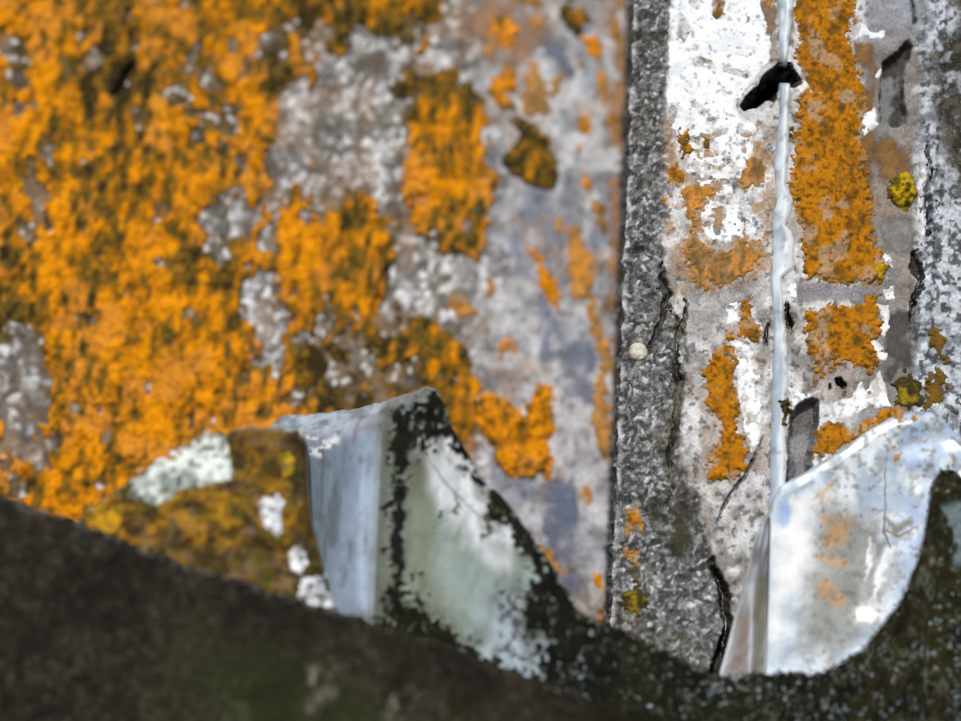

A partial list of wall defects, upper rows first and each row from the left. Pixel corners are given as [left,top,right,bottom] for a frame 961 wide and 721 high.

peeling [856,24,885,39]
peeling [791,80,809,99]
spalling [861,39,914,135]
crack [716,441,760,524]
crack [706,554,734,675]